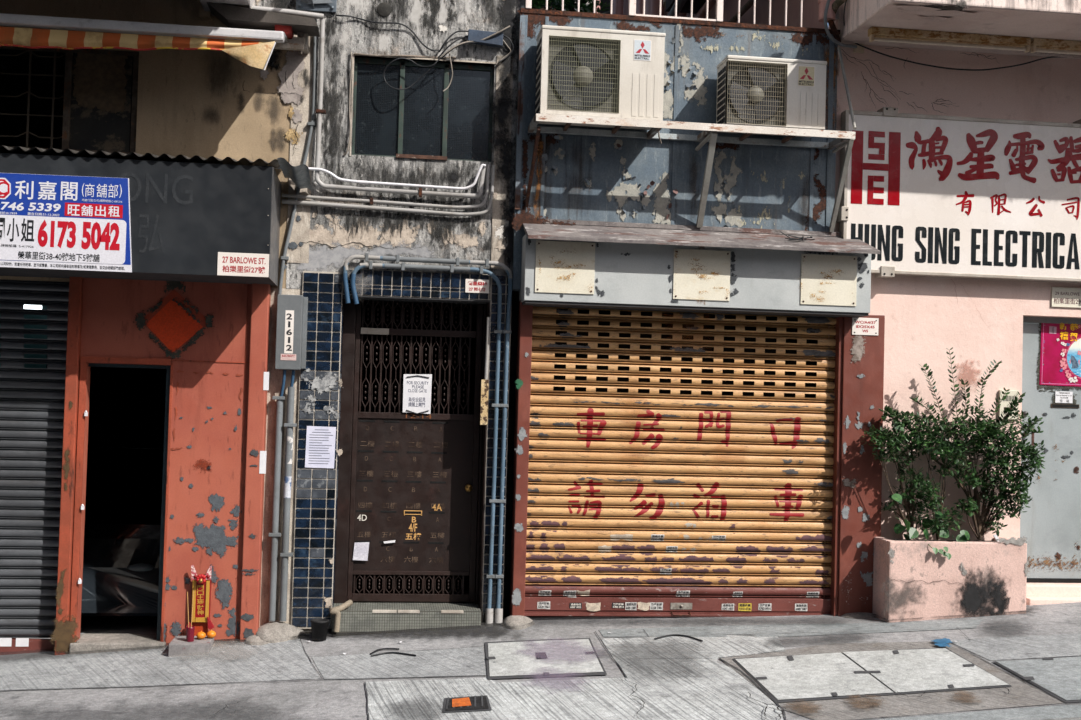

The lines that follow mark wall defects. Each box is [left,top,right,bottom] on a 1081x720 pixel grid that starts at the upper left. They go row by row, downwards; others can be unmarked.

mould [272,0,296,9]
rust [517,8,573,40]
rust [613,20,665,32]
damp [256,90,278,118]
damp [270,130,284,150]
damp [317,0,520,267]
peeling [606,137,678,225]
rust [805,148,826,231]
peeling [516,427,527,455]
peeling [169,493,242,636]
peeling [512,520,832,607]
rust [1028,541,1081,573]